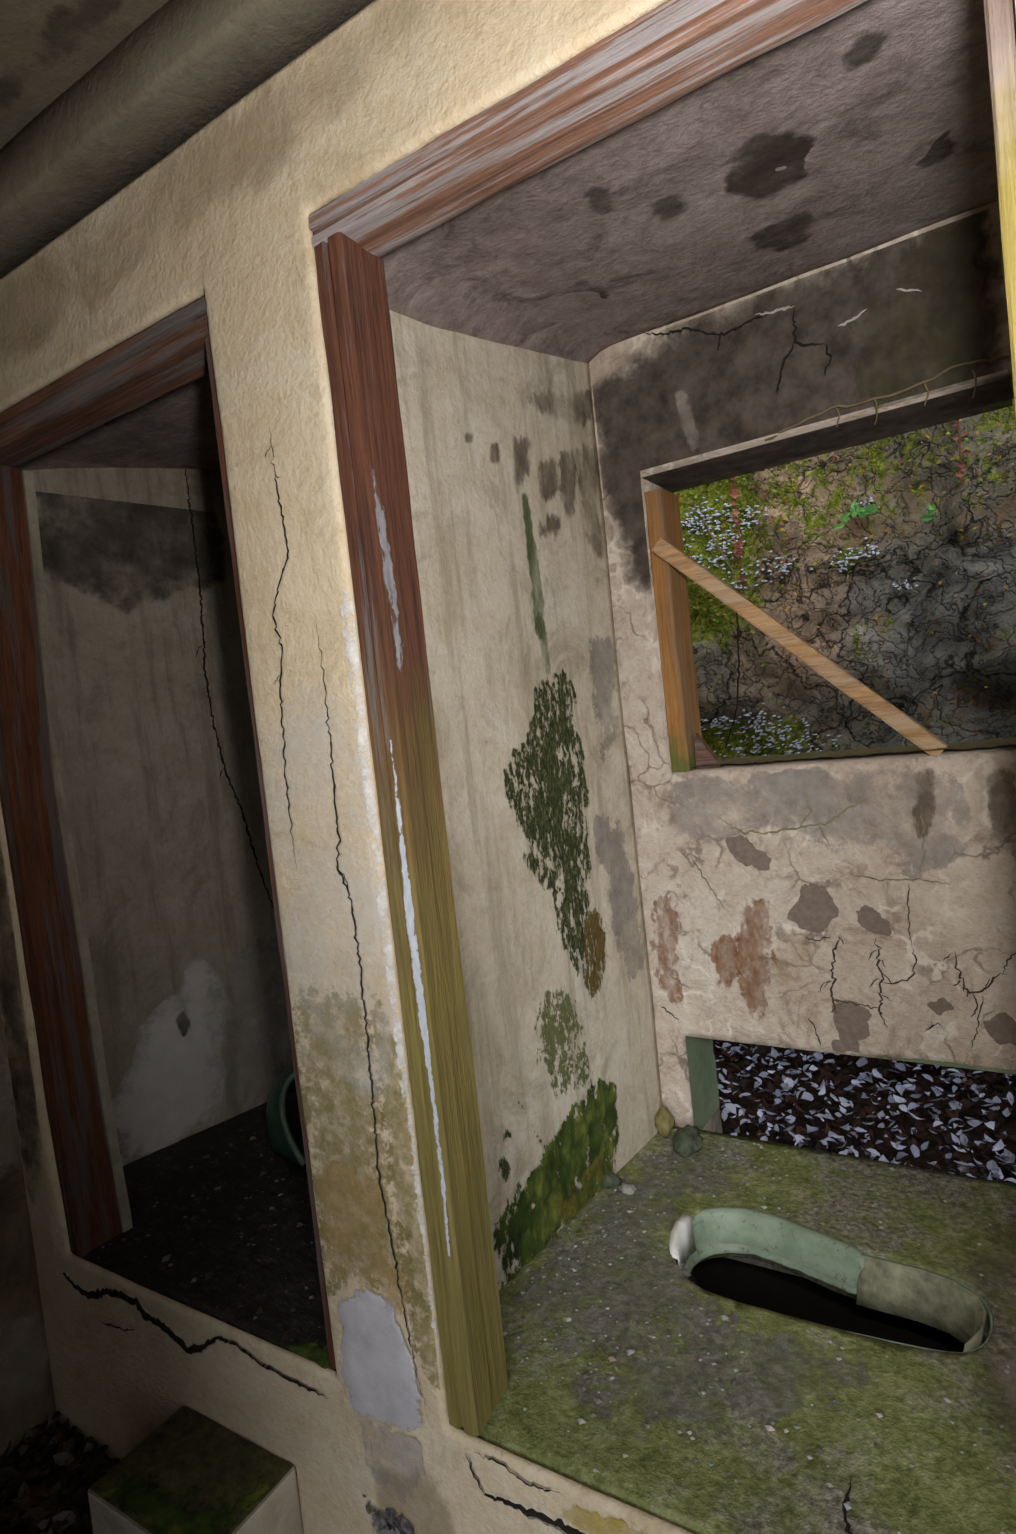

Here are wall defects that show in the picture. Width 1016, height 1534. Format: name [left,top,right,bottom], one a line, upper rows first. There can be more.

water stain [726,133,814,199]
water stain [36,491,225,610]
crack [185,428,297,908]
water stain [593,816,644,955]
spalling [726,835,771,871]
spalling [788,883,892,936]
crack [716,793,1016,1051]
crack [315,620,427,1415]
spalling [831,1000,872,1052]
spalling [983,1012,1016,1045]
water stain [369,994,439,1389]
crack [465,1452,591,1534]